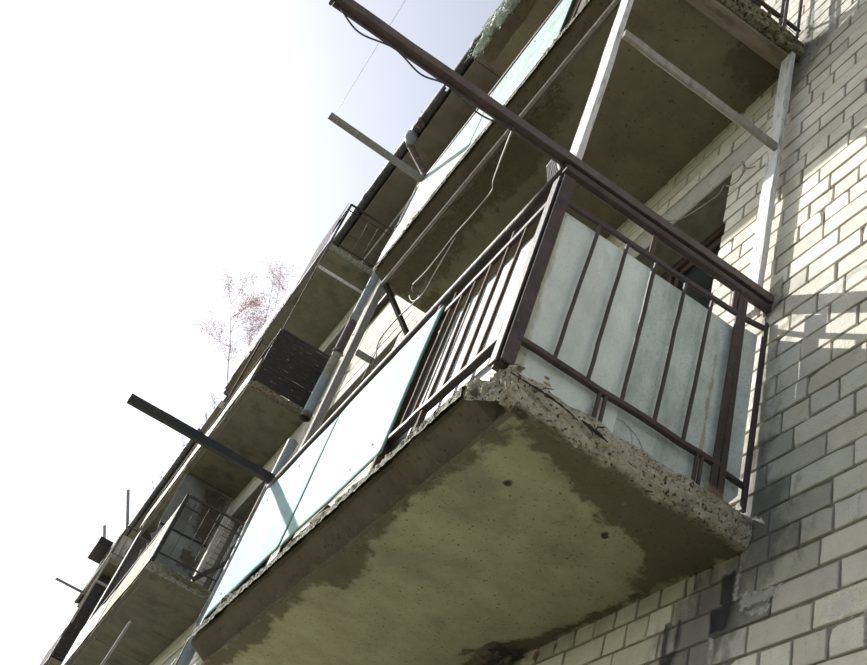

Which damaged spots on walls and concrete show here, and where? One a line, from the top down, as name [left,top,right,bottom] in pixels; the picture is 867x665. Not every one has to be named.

spalling [503,0,592,107]
spalling [719,0,806,61]
spalling [327,119,496,275]
spalling [147,364,753,665]
damp [204,407,741,665]